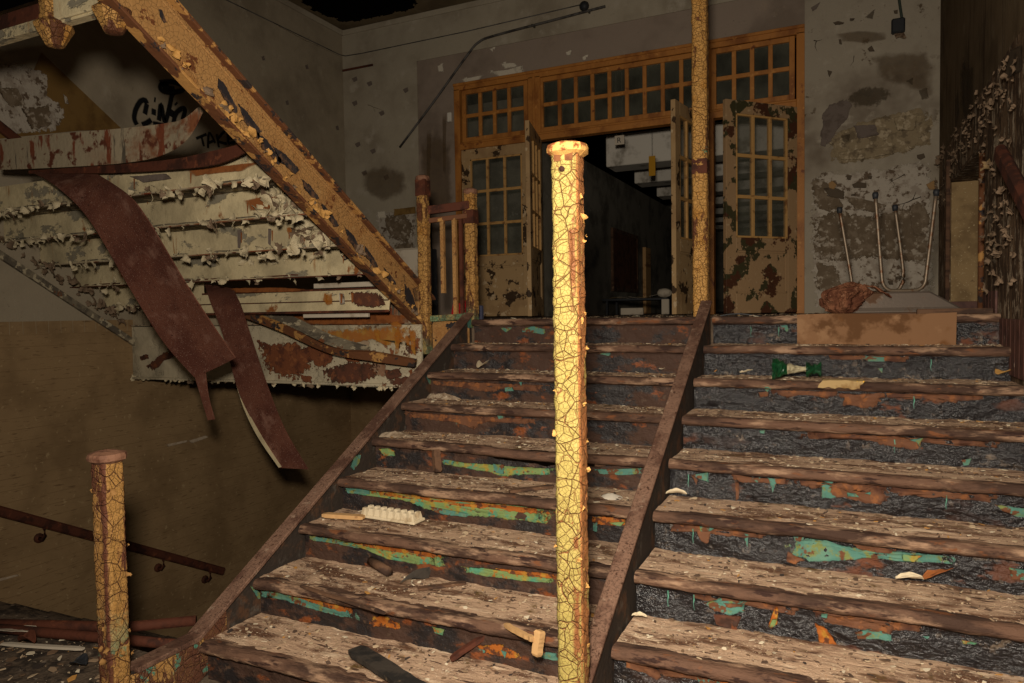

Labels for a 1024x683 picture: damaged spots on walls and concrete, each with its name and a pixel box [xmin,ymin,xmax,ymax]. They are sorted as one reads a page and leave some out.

flaking render [0,63,69,134]
rust [190,162,257,183]
flaking render [809,45,1022,307]
peeling [127,78,422,320]
rust [253,292,416,385]
rust [140,349,174,370]
peeling [442,459,556,477]
peeling [345,488,555,524]
peeling [310,535,451,567]
peeling [785,536,956,564]
peeling [461,566,556,583]
peeling [815,613,897,645]